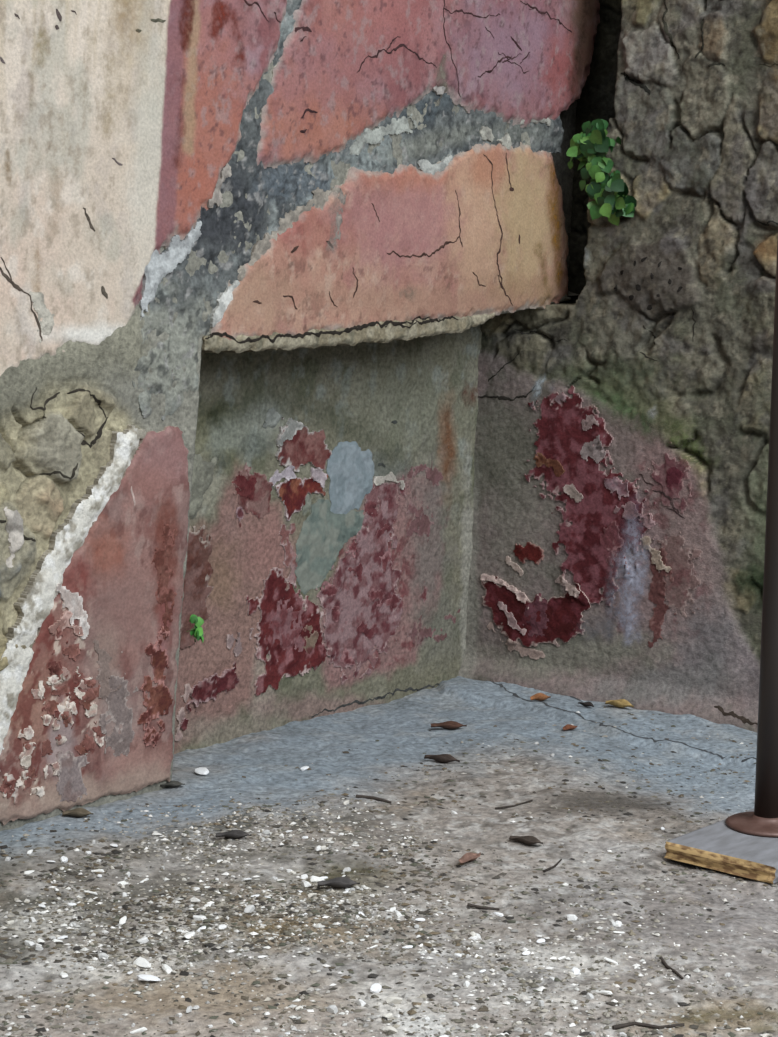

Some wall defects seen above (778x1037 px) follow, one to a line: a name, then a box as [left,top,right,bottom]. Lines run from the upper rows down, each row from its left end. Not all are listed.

spalling [286,0,302,16]
crack [0,257,55,343]
crack [132,0,572,420]
peeling [0,416,461,804]
peeling [480,385,702,660]
crack [485,680,758,762]